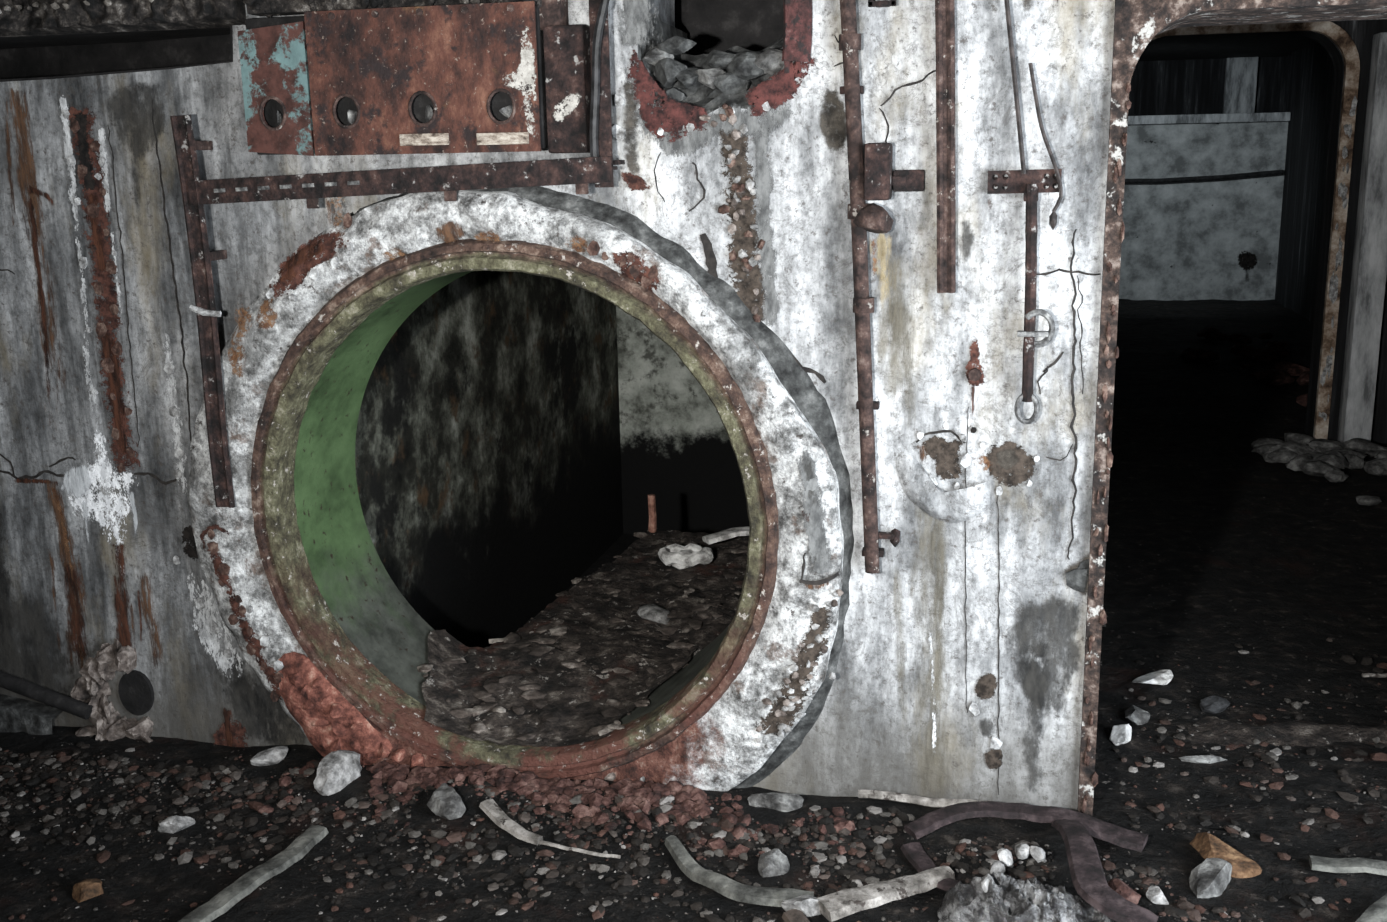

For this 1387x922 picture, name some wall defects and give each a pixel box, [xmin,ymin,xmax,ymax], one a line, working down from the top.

corrosion [360,0,385,9]
corrosion [425,0,542,9]
corrosion [5,88,66,403]
crack [1037,229,1101,560]
damp [61,430,138,572]
corrosion [278,652,425,768]
damp [1009,597,1079,789]